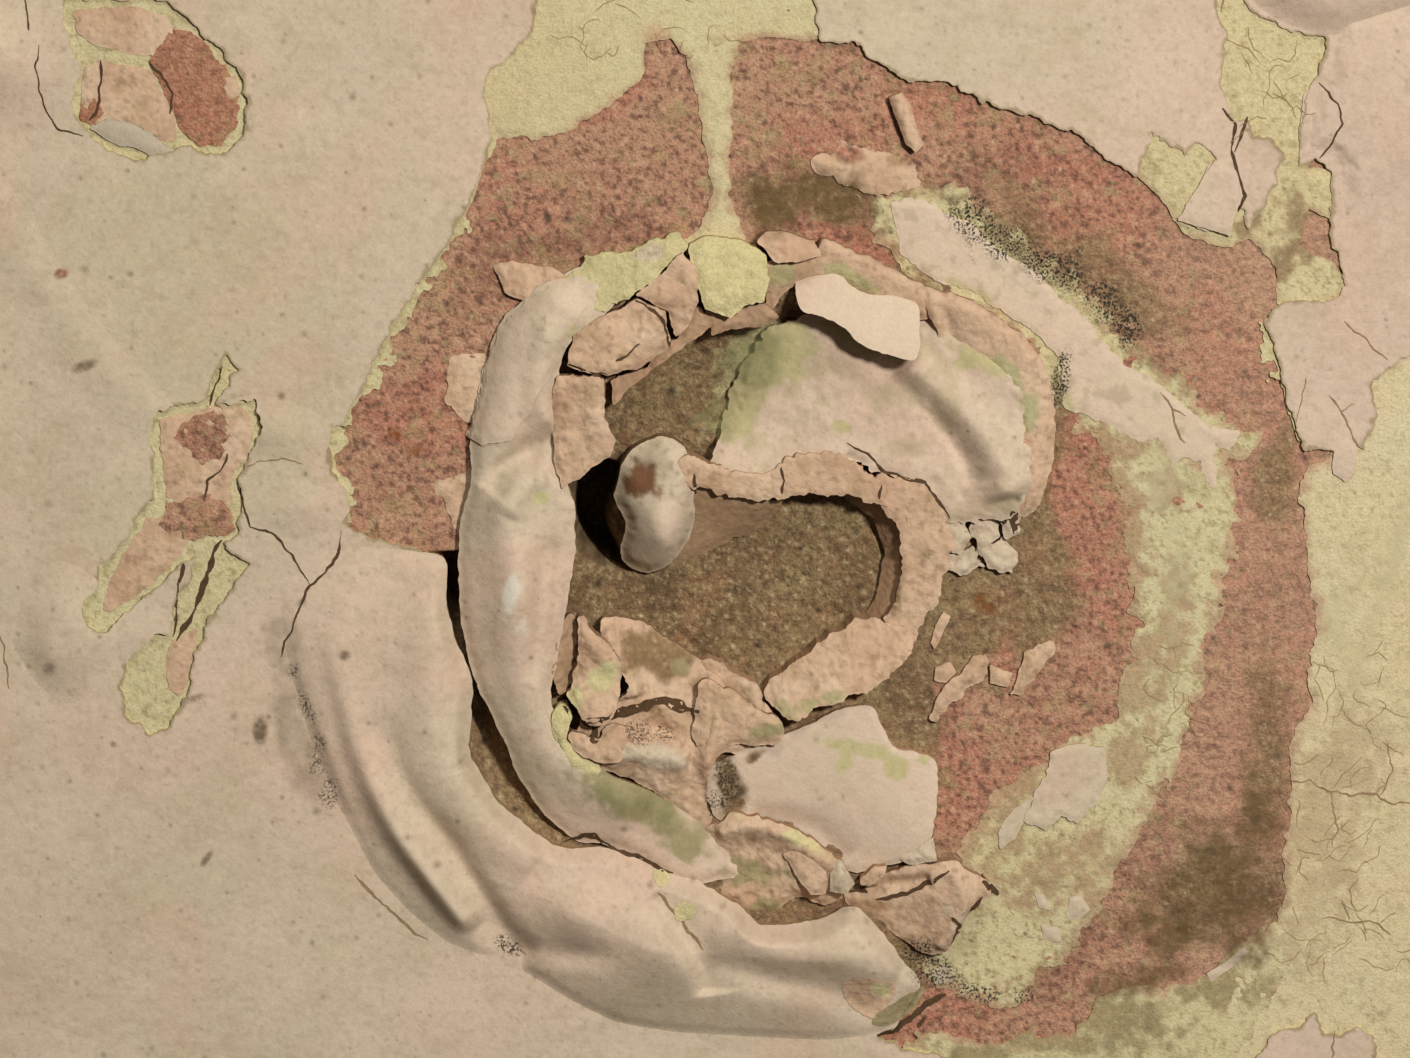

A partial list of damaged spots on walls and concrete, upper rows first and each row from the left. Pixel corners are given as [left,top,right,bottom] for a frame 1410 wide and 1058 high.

peeling [62,0,248,160]
peeling [82,355,263,734]
crack [210,367,222,405]
crack [173,454,341,657]
peeling [329,0,1410,1058]
crack [1263,640,1410,980]